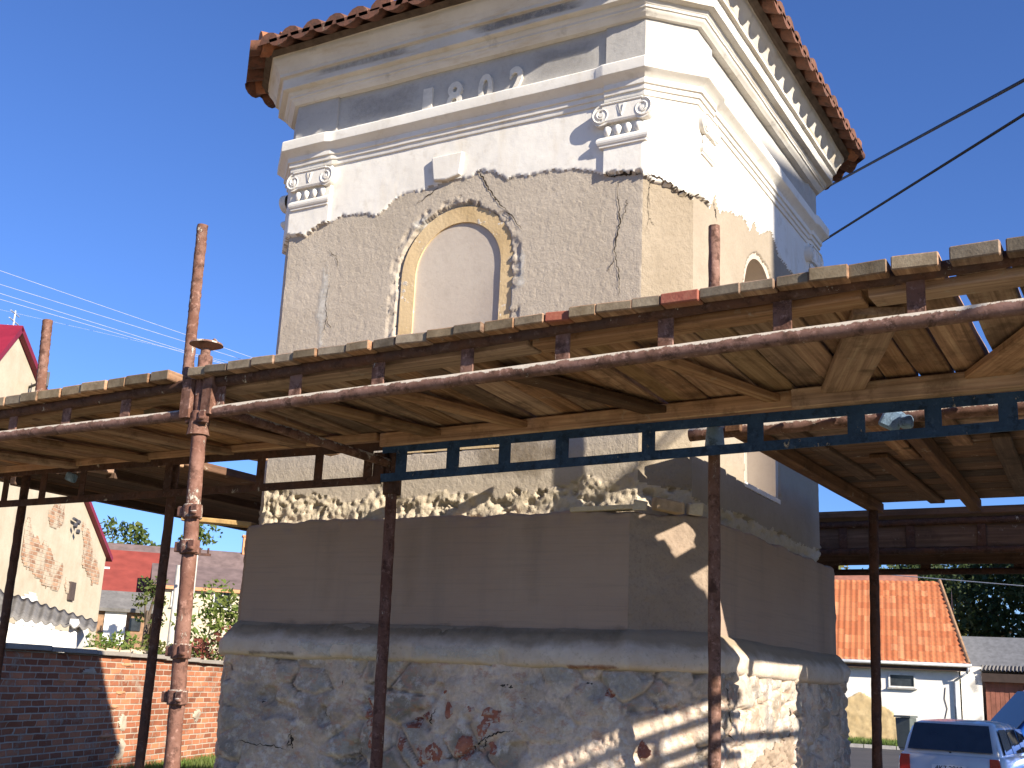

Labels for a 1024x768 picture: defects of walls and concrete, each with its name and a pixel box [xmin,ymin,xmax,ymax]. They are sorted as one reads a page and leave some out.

crack [477,169,522,229]
peeling [276,168,793,355]
crack [604,170,717,295]
peeling [21,517,70,593]
peeling [48,504,65,529]
peeling [81,522,100,585]
peeling [258,429,821,562]